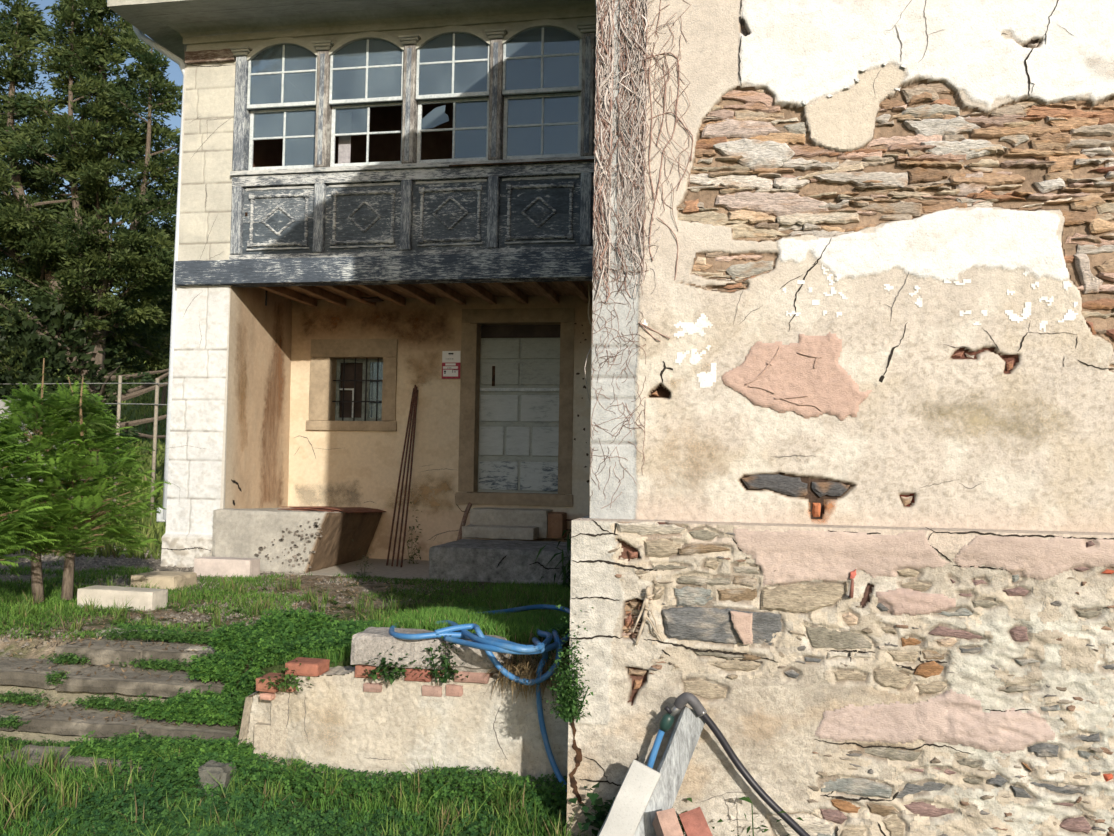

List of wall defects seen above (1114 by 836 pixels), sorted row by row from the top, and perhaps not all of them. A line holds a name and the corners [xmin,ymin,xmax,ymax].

crack [1024,0,1074,94]
spalling [677,62,1114,374]
peeling [674,314,716,388]
crack [733,239,831,330]
crack [879,273,909,383]
spalling [741,473,852,519]
crack [497,520,664,571]
crack [925,527,1114,570]
crack [569,635,776,662]
spalling [608,521,1114,836]
crack [827,650,947,671]
crack [569,718,621,807]